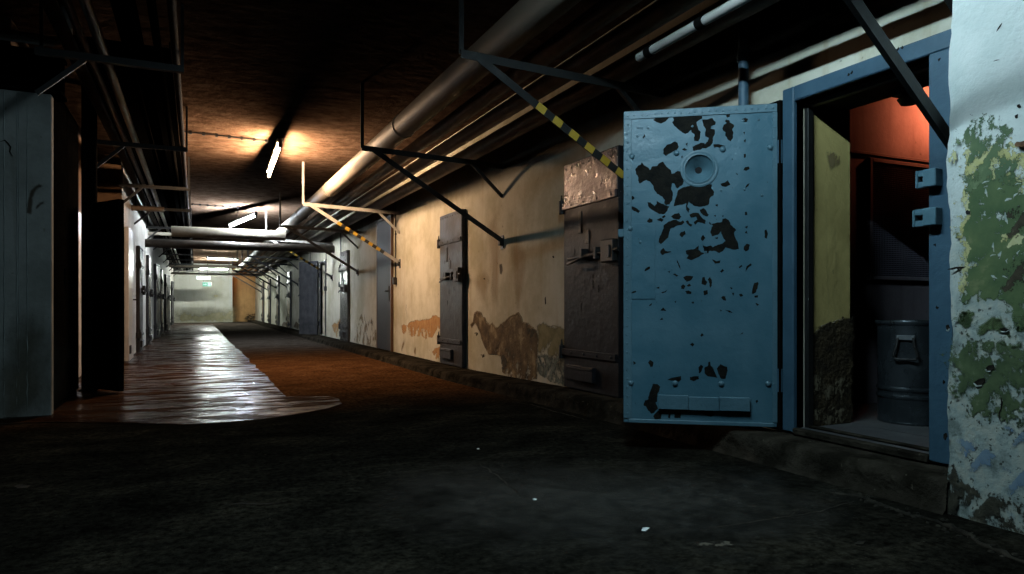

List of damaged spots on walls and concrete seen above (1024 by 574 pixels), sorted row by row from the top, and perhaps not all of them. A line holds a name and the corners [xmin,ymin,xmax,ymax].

peeling [632,114,752,303]
peeling [720,282,759,313]
peeling [940,104,1024,435]
spalling [402,315,440,359]
spalling [470,311,564,384]
spalling [943,464,1024,534]